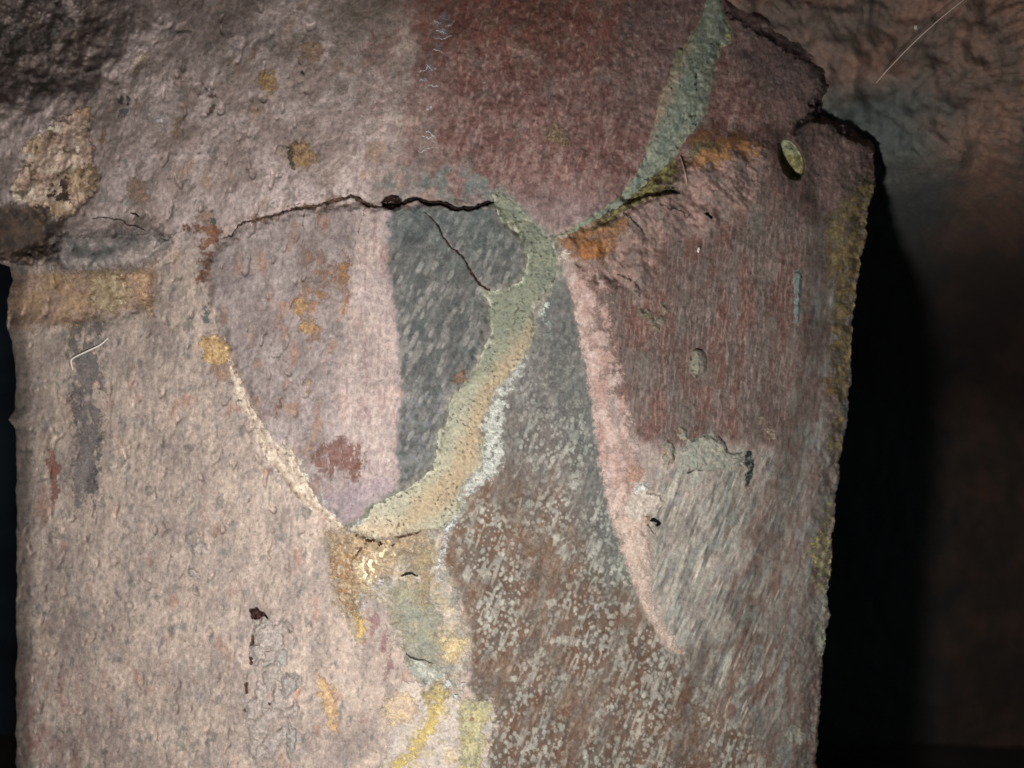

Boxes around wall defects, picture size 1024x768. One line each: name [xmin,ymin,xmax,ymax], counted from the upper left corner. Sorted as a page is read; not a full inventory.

crack [224,190,493,291]
flaking render [662,426,754,486]
flaking render [244,607,301,763]